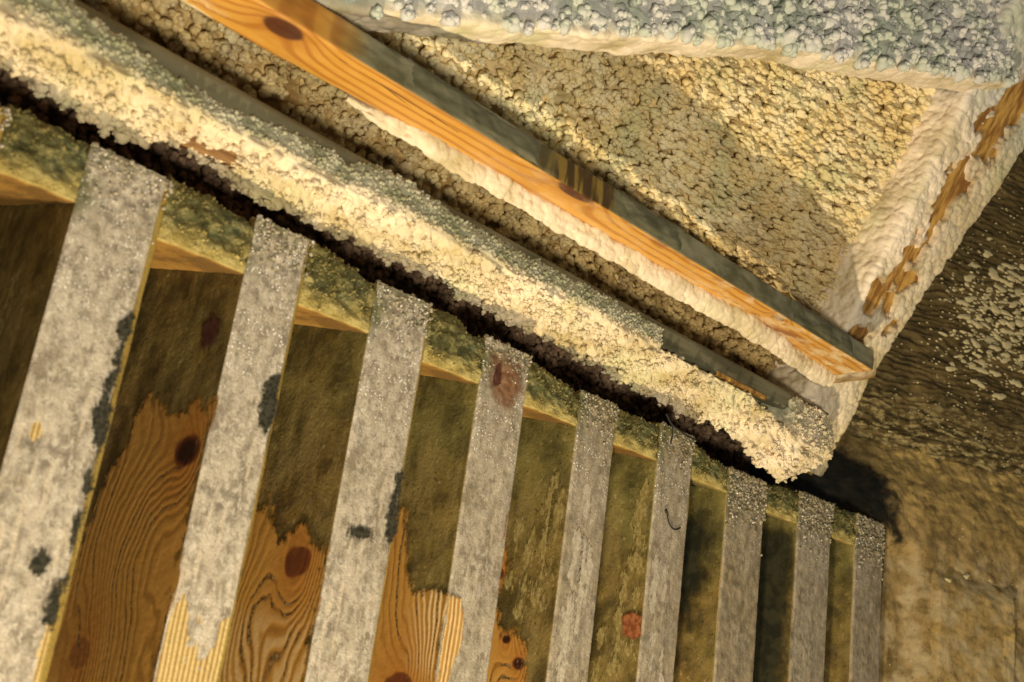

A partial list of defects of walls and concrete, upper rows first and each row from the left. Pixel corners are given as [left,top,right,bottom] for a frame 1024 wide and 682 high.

damp [0,0,1024,545]
rust [490,355,521,407]
damp [28,548,52,577]
peeling [46,392,219,682]
damp [41,573,70,631]
rust [621,612,642,639]